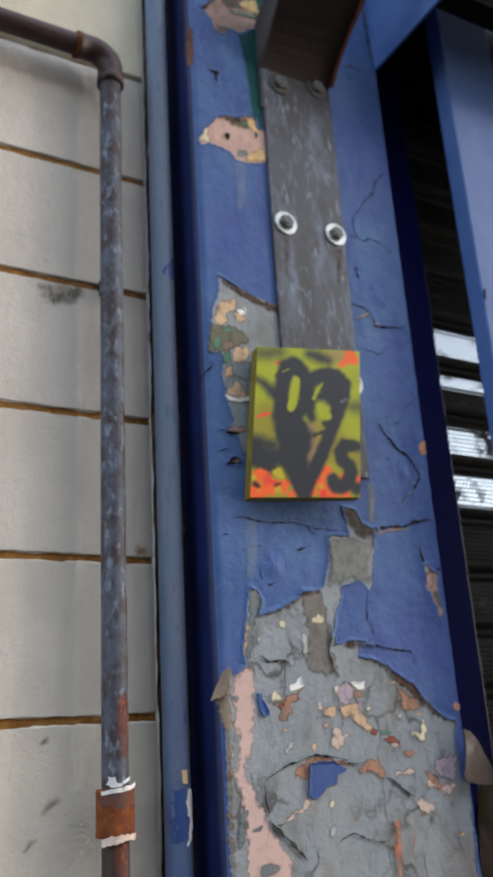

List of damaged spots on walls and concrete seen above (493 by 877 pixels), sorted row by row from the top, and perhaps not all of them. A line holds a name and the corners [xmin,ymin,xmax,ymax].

peeling [199,0,259,35]
peeling [196,113,266,166]
crack [349,171,397,254]
crack [353,303,404,356]
peeling [205,271,280,468]
crack [371,393,440,572]
peeling [210,504,493,877]
corrosion [118,692,129,756]
crack [261,752,362,860]
crack [389,776,415,797]
crack [338,833,392,846]